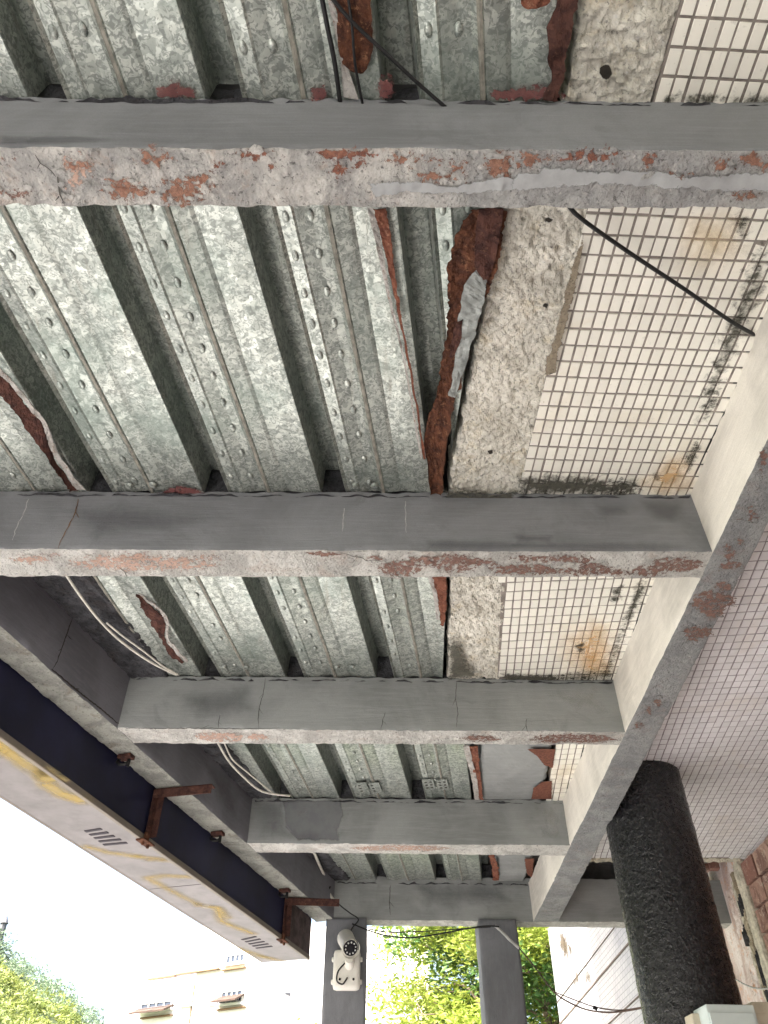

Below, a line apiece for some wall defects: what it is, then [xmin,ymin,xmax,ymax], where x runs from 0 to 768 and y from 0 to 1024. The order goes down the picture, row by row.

rust [328,0,373,100]
rust [490,0,579,102]
rust [99,144,285,208]
rust [312,147,470,185]
rust [483,144,625,178]
rust [367,207,507,496]
leakage [698,248,766,422]
rust [0,368,85,492]
leakage [686,442,700,471]
rust [136,593,188,664]
rust [366,553,704,626]
leakage [500,581,646,681]